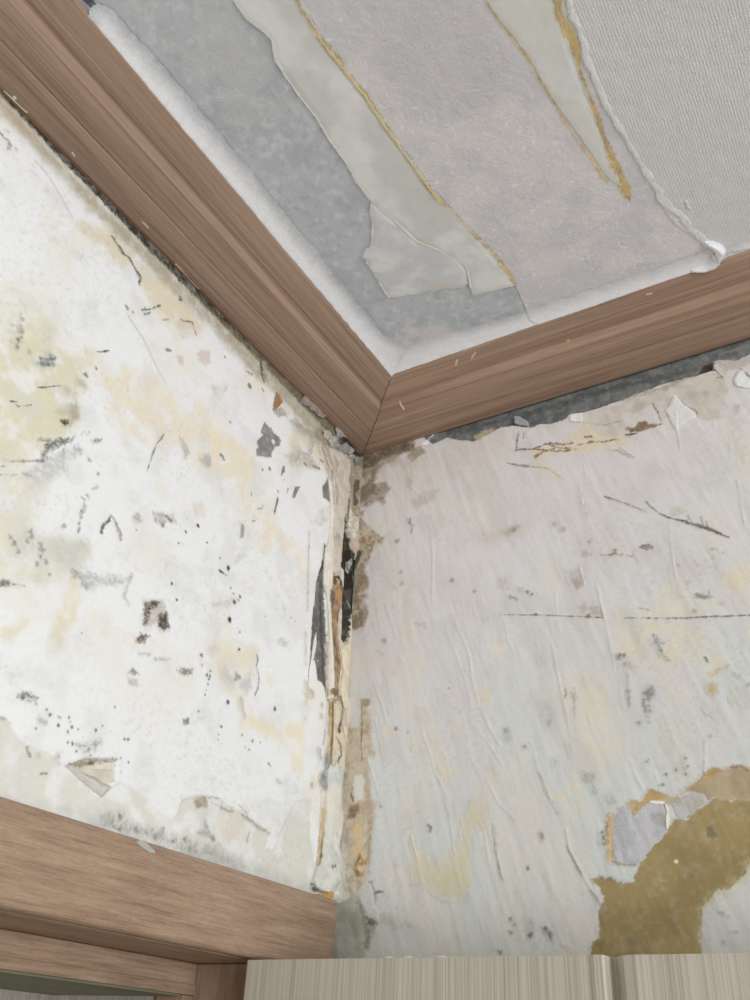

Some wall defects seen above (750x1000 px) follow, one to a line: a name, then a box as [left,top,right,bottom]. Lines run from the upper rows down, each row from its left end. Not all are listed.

crack [514,431,632,459]
spalling [421,338,750,459]
leakage [0,91,441,959]
flaking render [239,361,363,771]
crack [500,589,750,620]